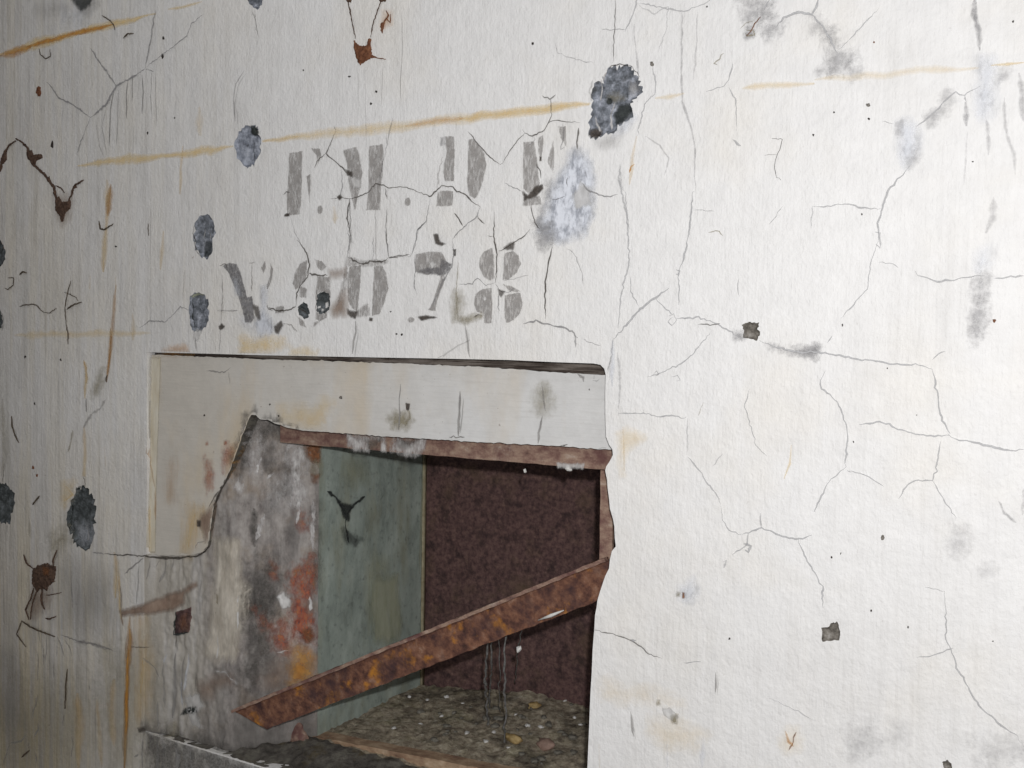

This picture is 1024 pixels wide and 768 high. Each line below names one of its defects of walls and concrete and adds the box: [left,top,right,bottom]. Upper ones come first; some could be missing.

crack [764,1,872,52]
spalling [234,125,261,168]
spalling [588,63,643,140]
crack [270,220,327,312]
crack [314,95,1020,606]
corrosion [307,445,320,479]
peeling [347,433,425,456]
spalling [66,477,96,551]
corrosion [119,583,196,768]
peeling [206,539,250,660]
corrosion [271,562,316,683]
crack [920,588,1023,745]